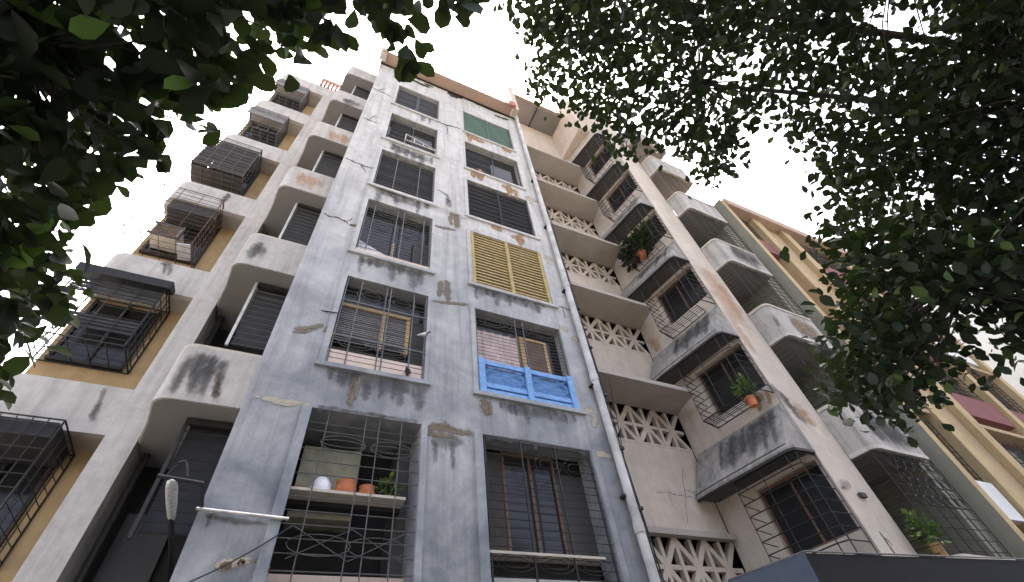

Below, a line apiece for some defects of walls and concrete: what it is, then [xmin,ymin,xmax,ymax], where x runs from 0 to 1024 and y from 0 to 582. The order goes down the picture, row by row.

damp [171,355,227,397]
damp [719,412,776,466]
crack [658,476,697,521]
spalling [214,556,252,570]